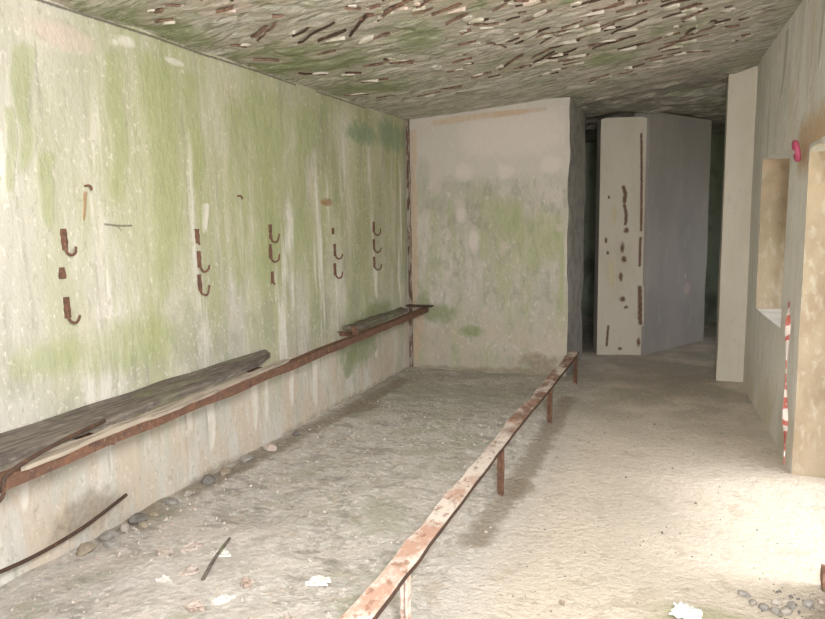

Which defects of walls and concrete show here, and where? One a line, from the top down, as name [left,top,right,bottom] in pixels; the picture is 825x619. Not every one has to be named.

water stain [11,14,130,211]
water stain [179,67,210,234]
water stain [218,96,251,307]
water stain [280,100,321,290]
corrosion [604,132,644,284]
corrosion [605,324,623,351]
corrosion [618,284,644,349]